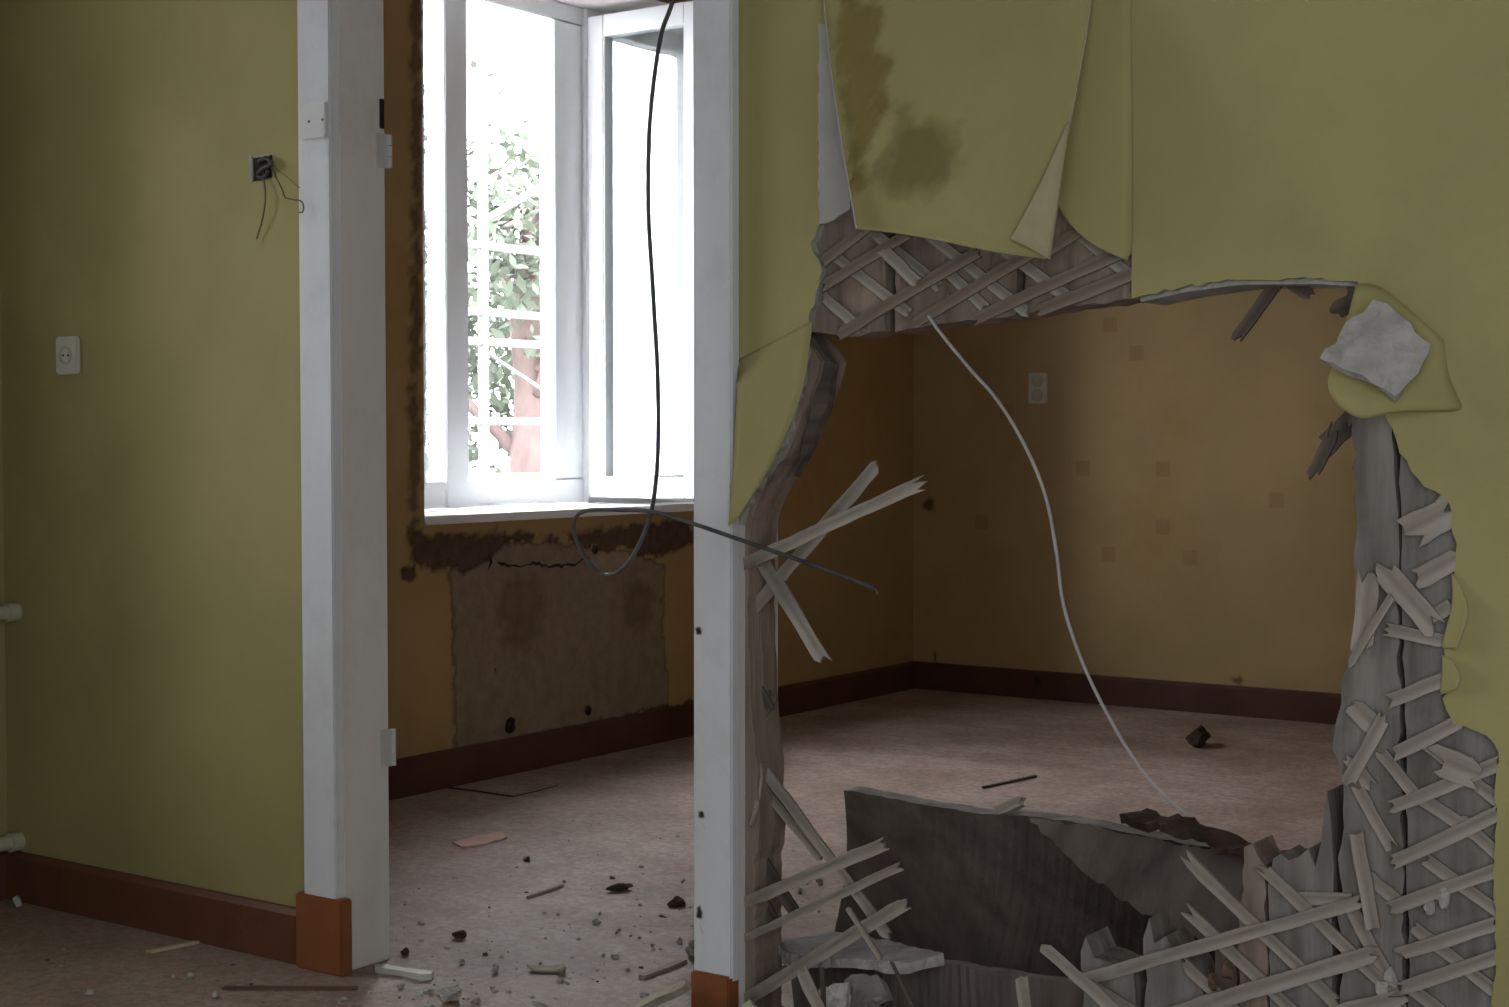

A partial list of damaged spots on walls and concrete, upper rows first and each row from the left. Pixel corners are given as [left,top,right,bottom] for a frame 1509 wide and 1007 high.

peeling [449,541,668,748]
flaking render [743,23,1143,1007]
flaking render [1333,414,1499,1007]